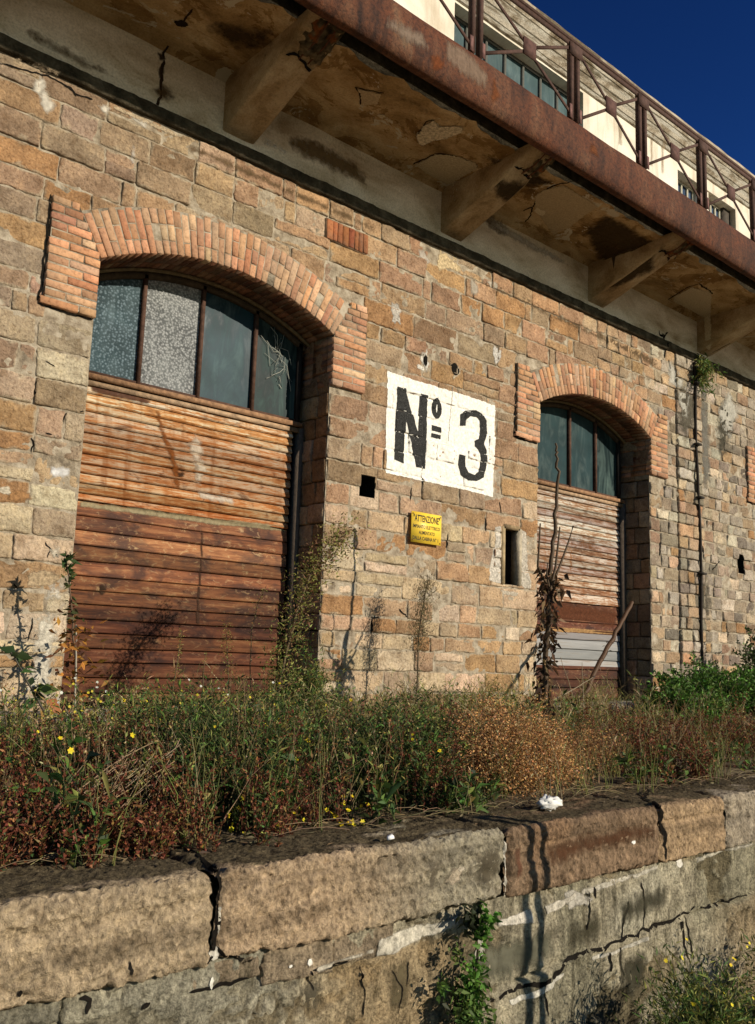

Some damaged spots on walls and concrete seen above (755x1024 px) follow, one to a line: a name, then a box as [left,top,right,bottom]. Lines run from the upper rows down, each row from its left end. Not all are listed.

crack [0,63,93,100]
spalling [286,18,345,72]
rust [388,20,425,47]
rust [432,42,500,101]
leakage [275,138,365,182]
peeling [413,120,478,201]
leakage [495,176,550,201]
leakage [586,217,652,268]
leakage [610,257,653,288]
crack [638,791,667,859]
crack [183,846,249,993]
crack [489,883,751,1018]